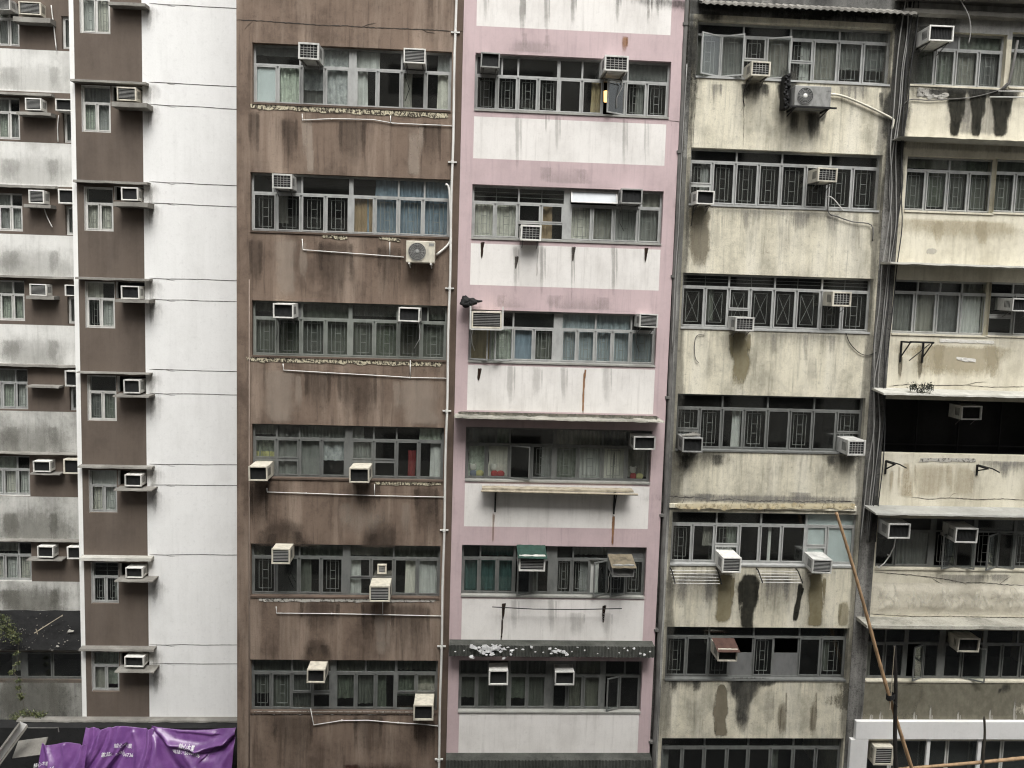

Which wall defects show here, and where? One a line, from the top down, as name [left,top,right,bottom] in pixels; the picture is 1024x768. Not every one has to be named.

damp [931,87,1019,136]
damp [689,208,710,263]
damp [729,333,751,383]
damp [687,574,759,628]
damp [793,574,826,626]
damp [713,678,776,736]